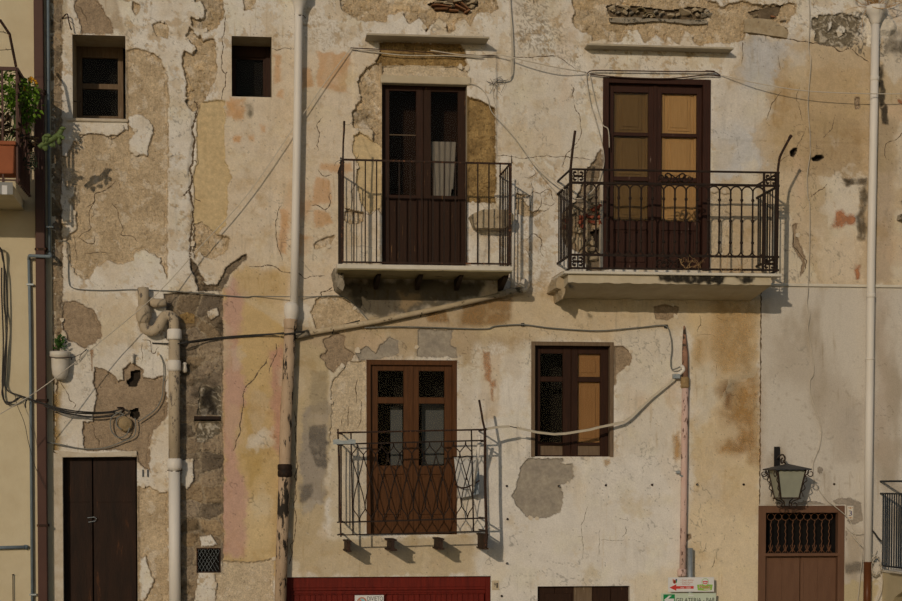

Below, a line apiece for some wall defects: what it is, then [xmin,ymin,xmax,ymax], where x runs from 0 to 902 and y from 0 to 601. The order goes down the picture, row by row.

spalling [341,0,497,33]
spalling [572,0,794,45]
peeling [50,0,173,351]
crack [183,101,205,285]
spalling [344,41,470,223]
flaking render [467,98,498,205]
peeling [83,363,168,469]
peeling [137,483,169,601]
flaking render [165,293,276,601]
crack [233,344,277,451]
peeling [311,297,398,442]
peeling [512,459,573,520]